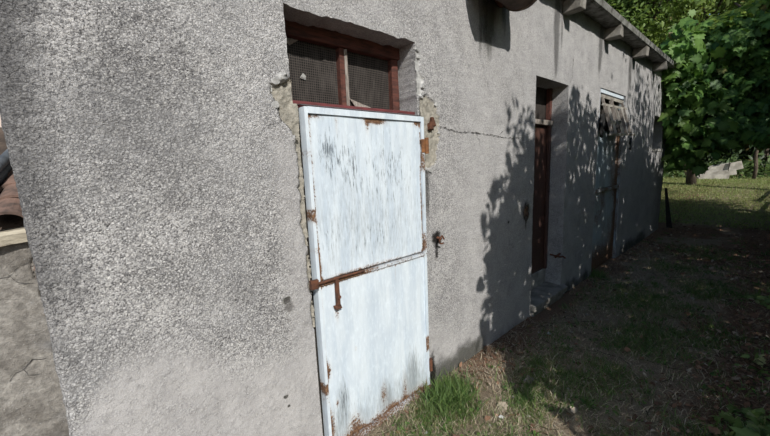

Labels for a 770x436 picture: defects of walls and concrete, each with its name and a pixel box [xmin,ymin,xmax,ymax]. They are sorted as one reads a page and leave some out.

spalling [414,47,440,173]
crack [443,127,521,141]
spalling [270,72,315,327]
crack [9,358,46,382]